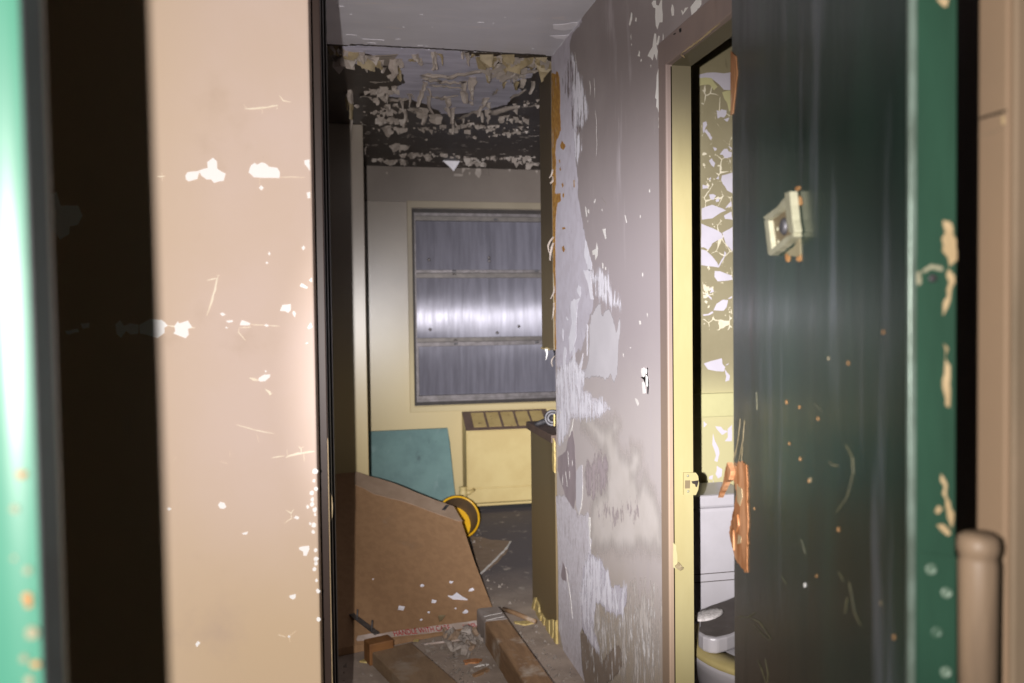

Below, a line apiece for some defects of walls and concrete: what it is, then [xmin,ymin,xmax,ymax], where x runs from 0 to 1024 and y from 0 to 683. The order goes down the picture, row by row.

spalling [185,158,226,183]
spalling [249,162,280,190]
peeling [699,54,733,316]
spalling [916,221,957,315]
spalling [220,312,275,340]
spalling [327,18,684,682]
peeling [704,358,730,382]
spalling [942,344,950,407]
peeling [704,422,732,482]
spalling [935,474,954,536]